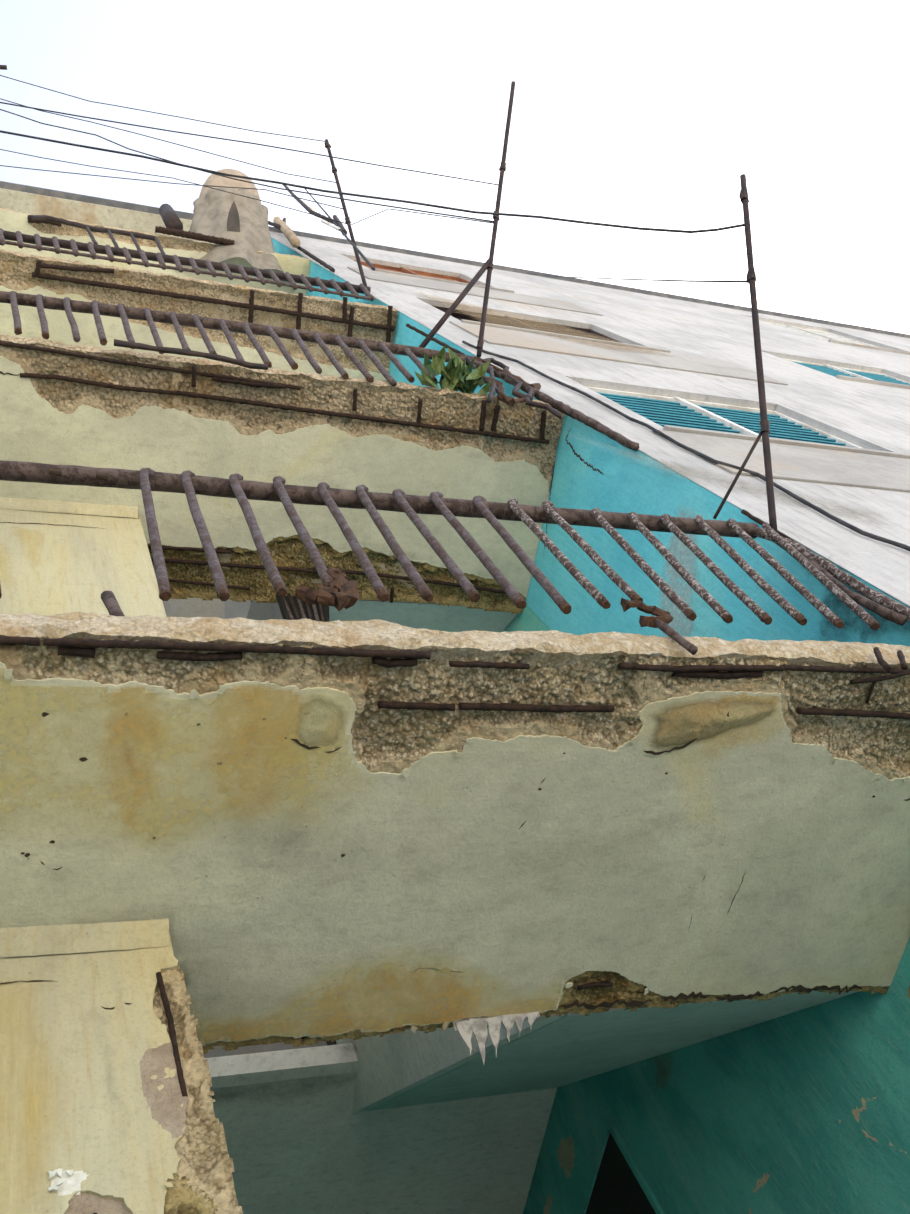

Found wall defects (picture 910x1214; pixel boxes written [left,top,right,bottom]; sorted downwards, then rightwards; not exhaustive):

spalling [0,253,465,373]
spalling [0,341,592,492]
damp [214,691,338,801]
spalling [0,635,910,782]
spalling [139,965,888,1214]
peeling [839,1096,907,1154]
spalling [48,1168,131,1214]